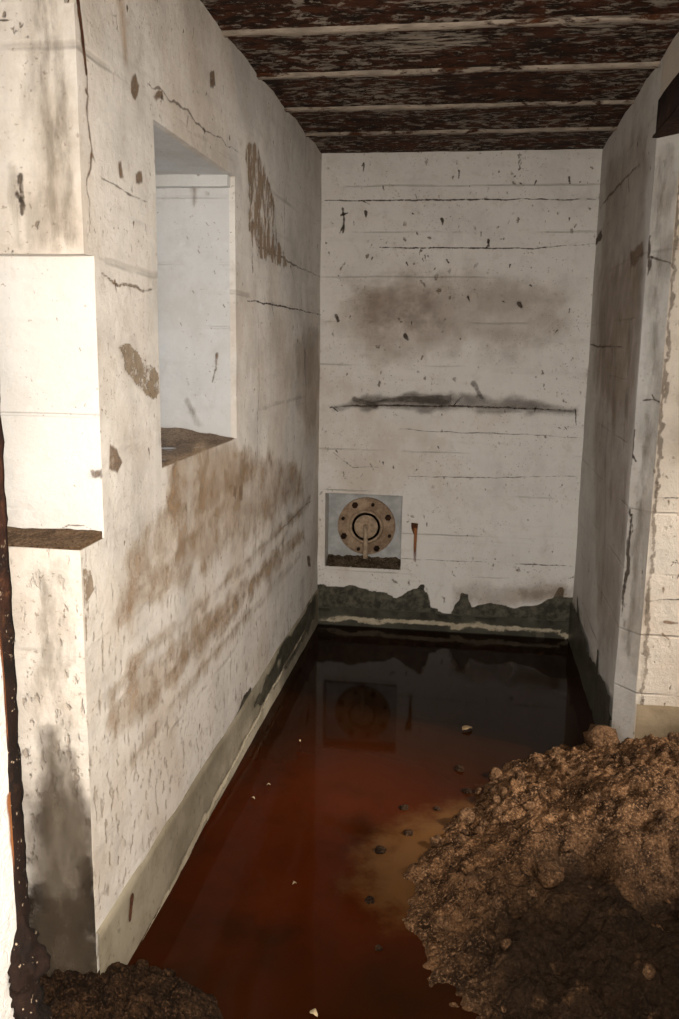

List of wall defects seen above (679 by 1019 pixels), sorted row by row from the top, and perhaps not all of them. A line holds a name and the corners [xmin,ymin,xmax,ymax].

peeling [384,0,480,9]
peeling [347,30,506,59]
spalling [131,74,139,99]
crack [149,84,230,148]
peeling [245,142,291,272]
peeling [120,344,159,399]
damp [398,396,445,405]
peeling [91,446,122,478]
damp [168,448,300,561]
crack [622,509,679,611]
damp [143,584,610,939]
damp [30,734,97,977]